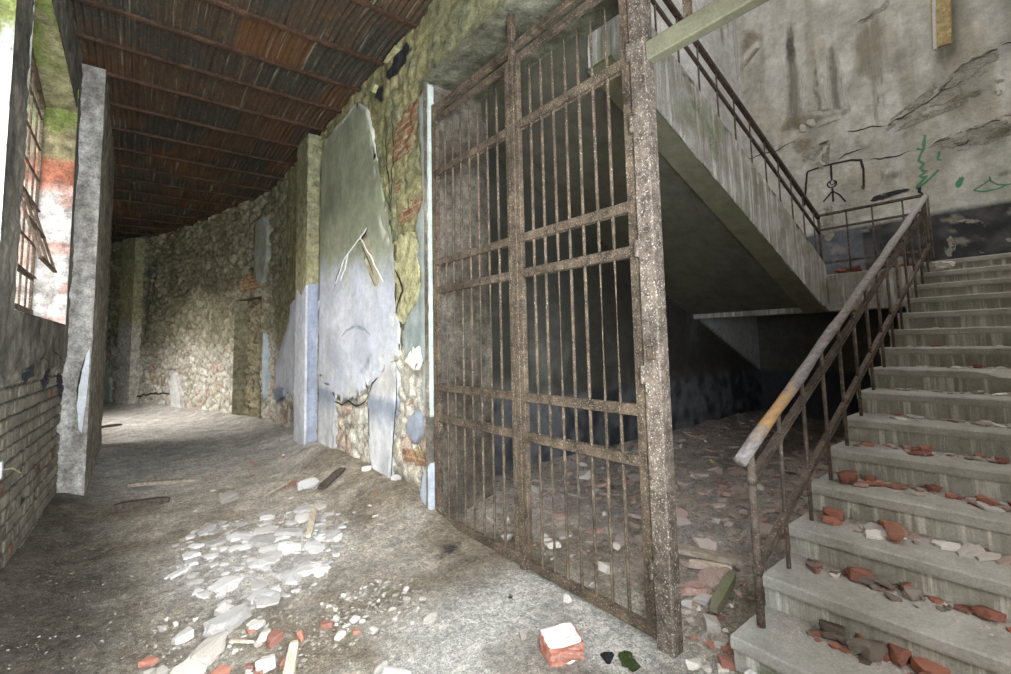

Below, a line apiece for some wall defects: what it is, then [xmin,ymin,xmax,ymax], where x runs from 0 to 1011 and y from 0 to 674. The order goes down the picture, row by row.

leakage [784,26,830,130]
leakage [815,48,850,108]
crack [839,125,910,160]
flaking render [887,48,998,132]
flaking render [930,113,1011,151]
flaking render [262,42,435,510]